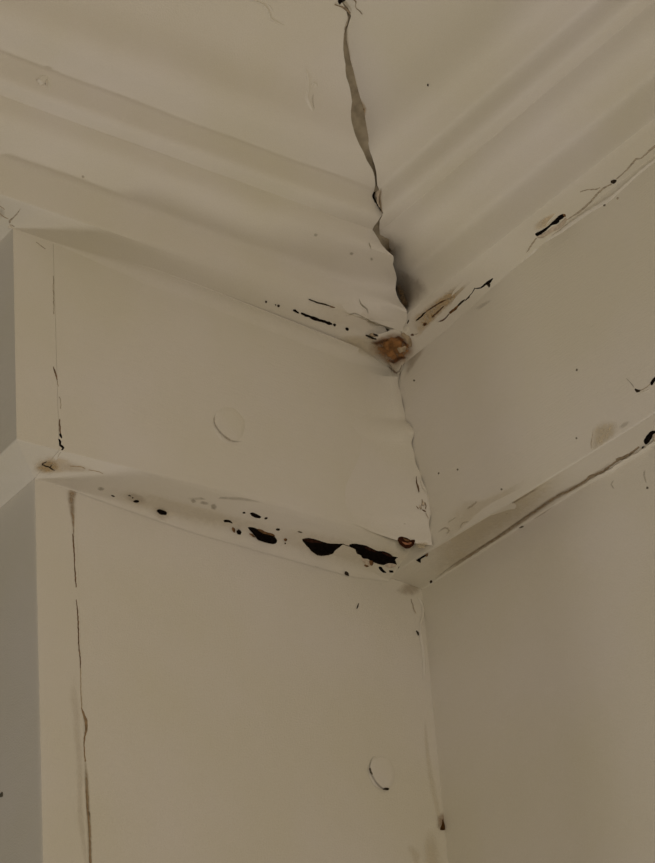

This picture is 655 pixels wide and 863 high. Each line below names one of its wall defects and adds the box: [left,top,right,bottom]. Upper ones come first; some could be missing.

crack [335,0,389,252]
spalling [535,214,566,236]
corrosion [366,294,455,374]
crack [42,366,103,474]
crack [635,377,655,394]
spalling [224,512,277,544]
spalling [302,538,398,565]
crack [70,492,92,863]